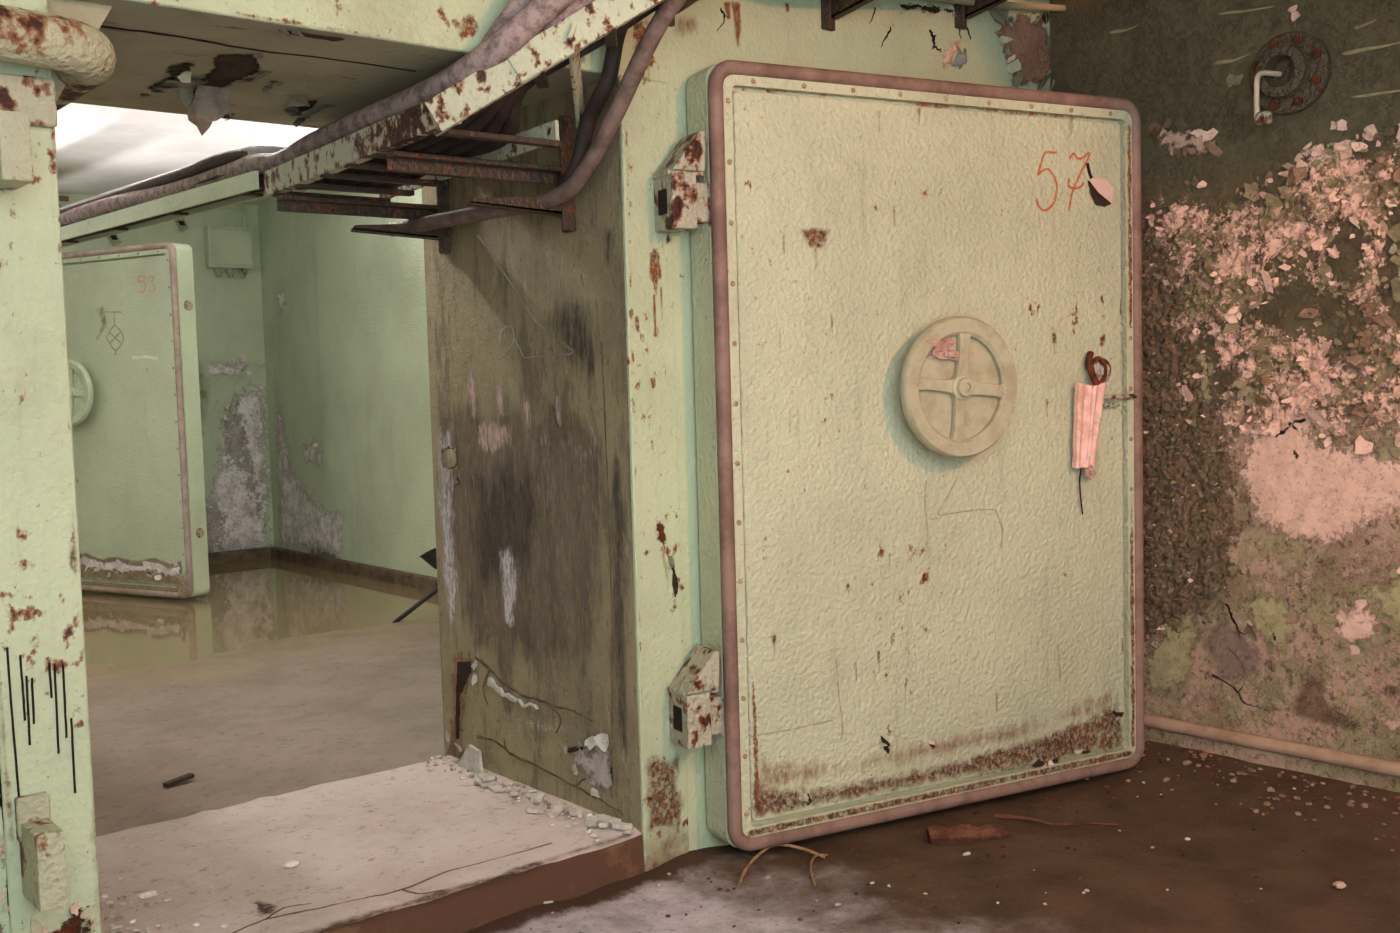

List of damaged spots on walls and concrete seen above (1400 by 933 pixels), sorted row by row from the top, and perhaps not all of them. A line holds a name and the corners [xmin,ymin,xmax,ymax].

peeling [277,28,344,42]
corrosion [454,15,478,39]
corrosion [724,3,740,44]
peeling [140,53,336,135]
peeling [1141,117,1400,697]
peeling [205,354,347,556]
damp [439,368,626,746]
corrosion [748,506,1135,837]
damp [1295,679,1355,727]
spalling [562,733,615,802]
corrosion [648,757,680,827]
peeling [0,834,97,933]